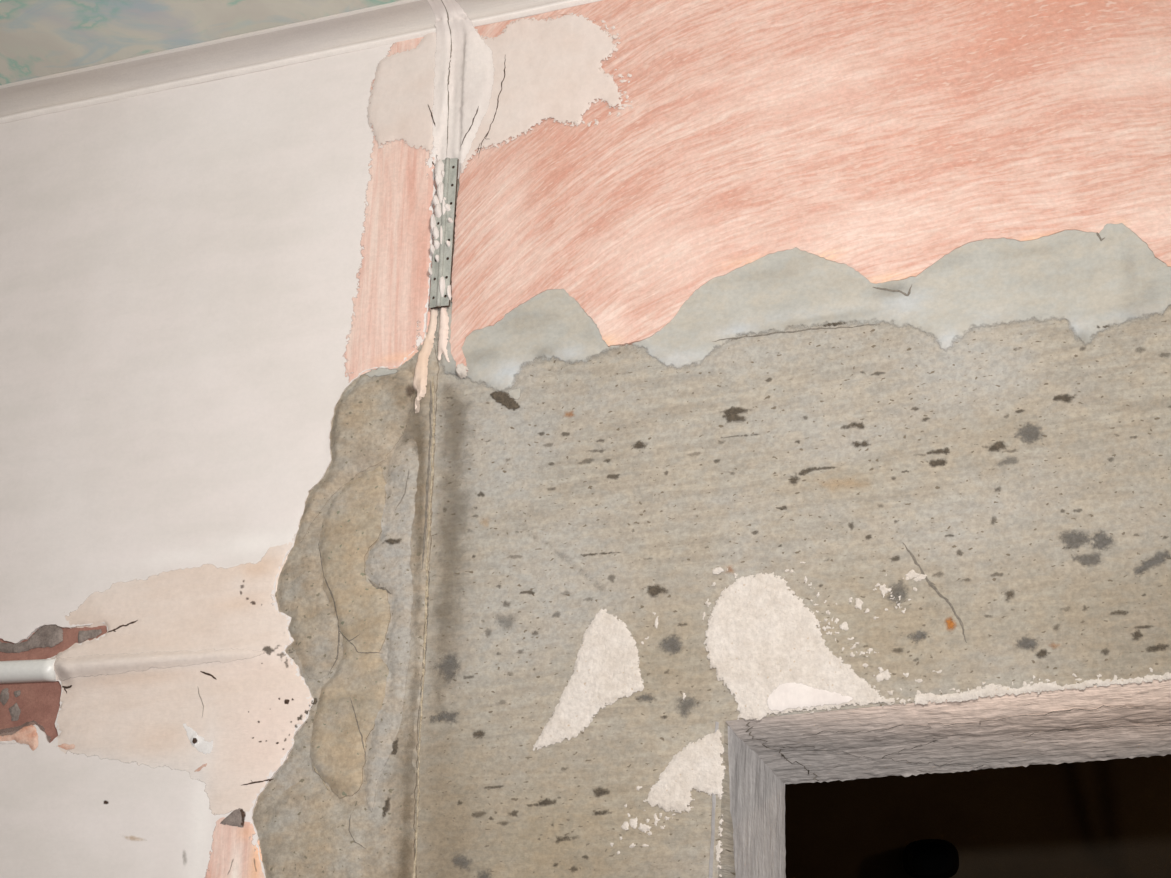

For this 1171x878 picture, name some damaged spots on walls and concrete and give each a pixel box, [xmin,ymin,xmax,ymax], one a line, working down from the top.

spalling [490,388,521,410]
spalling [723,407,746,422]
spalling [927,448,949,466]
flaking render [205,307,469,878]
damp [889,587,905,603]
crack [902,542,967,643]
flaking render [785,562,942,695]
flaking render [0,625,107,661]
damp [660,635,681,652]
damp [439,656,458,678]
flaking render [0,682,75,751]
damp [431,713,455,722]